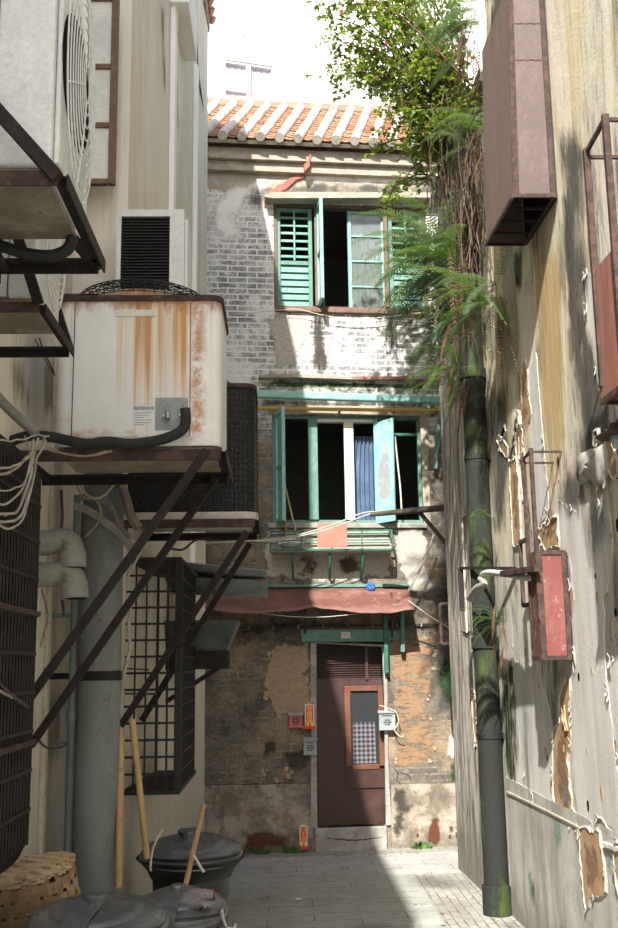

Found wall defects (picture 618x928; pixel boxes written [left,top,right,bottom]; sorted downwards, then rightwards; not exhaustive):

leakage [311,313,327,371]
leakage [386,315,397,350]
peeling [496,246,618,913]
peeling [263,642,311,718]
peeling [390,635,438,767]